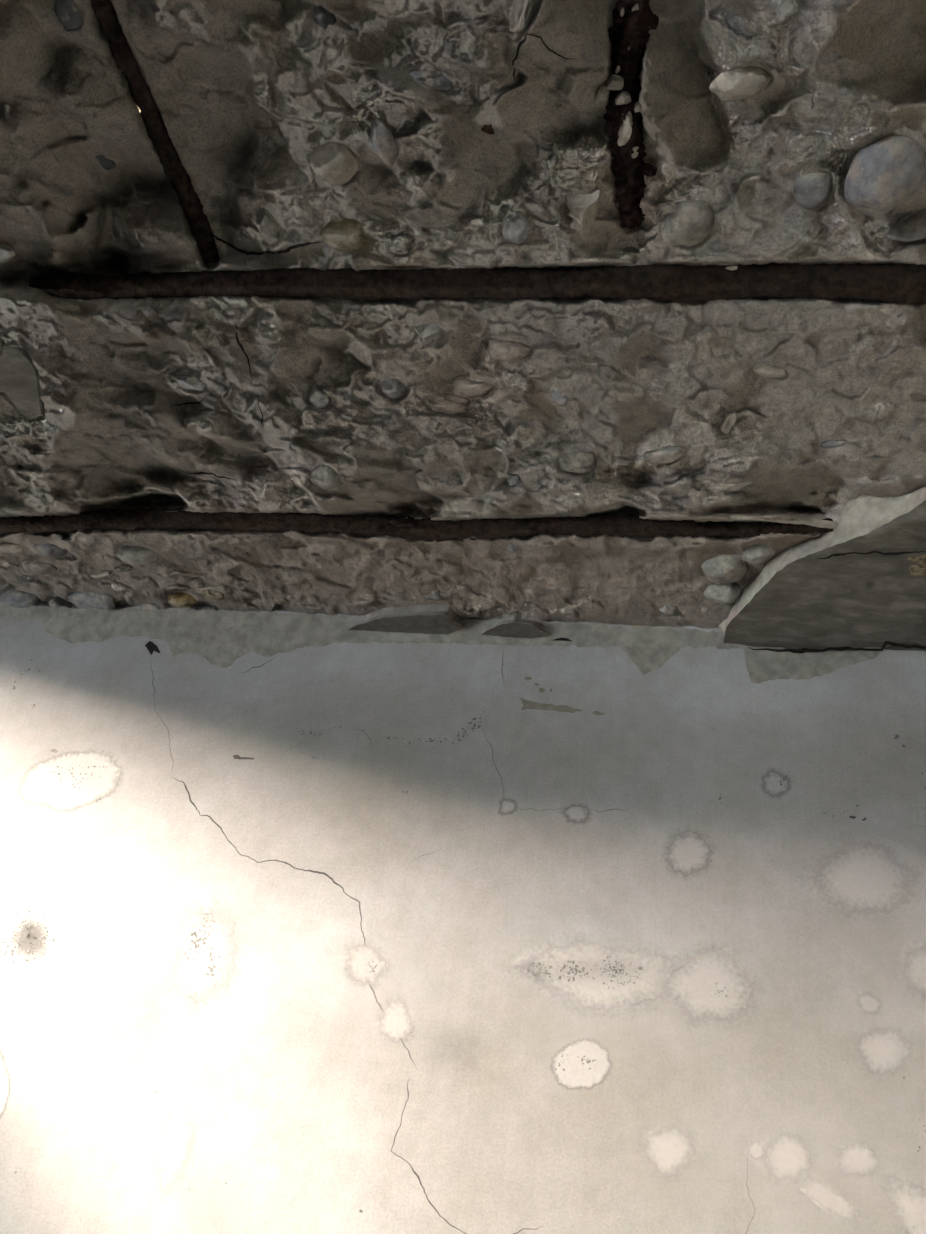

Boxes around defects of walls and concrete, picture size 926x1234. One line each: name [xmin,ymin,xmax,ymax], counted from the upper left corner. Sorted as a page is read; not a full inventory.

corrosion [635,158,657,199]
spalling [0,0,926,684]
crack [151,668,365,949]
leakage [670,833,708,873]
efflorescence [818,846,911,909]
leakage [527,945,746,1017]
leakage [860,1031,909,1087]
crack [368,979,466,1234]
efflorescence [648,1130,690,1171]
efflorescence [749,1137,853,1219]
leakage [840,1146,877,1174]
leakage [895,1187,926,1234]